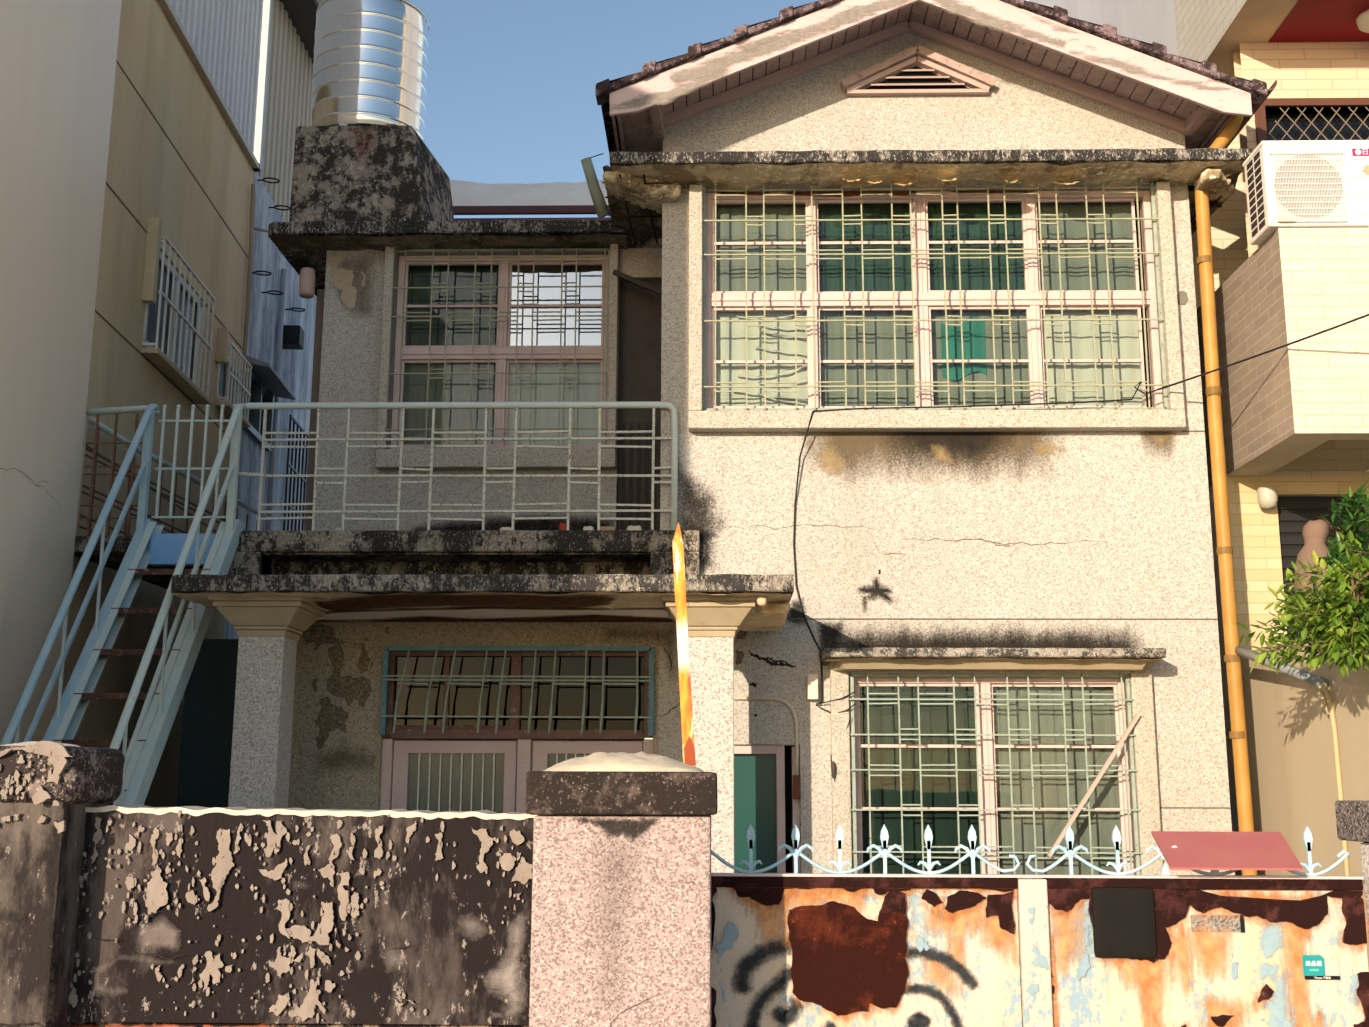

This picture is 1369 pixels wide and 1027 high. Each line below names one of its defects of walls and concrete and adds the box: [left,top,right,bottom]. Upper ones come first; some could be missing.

leakage [809,432,1055,475]
leakage [1144,432,1172,450]
leakage [678,468,721,568]
crack [729,524,1108,555]
spalling [303,609,672,750]
leakage [788,602,1135,665]
peeling [0,741,73,834]
peeling [77,810,456,1023]
peeling [472,825,533,924]
corrosion [684,881,1016,1021]
corrosion [1047,889,1093,1027]
corrosion [1103,889,1369,1027]